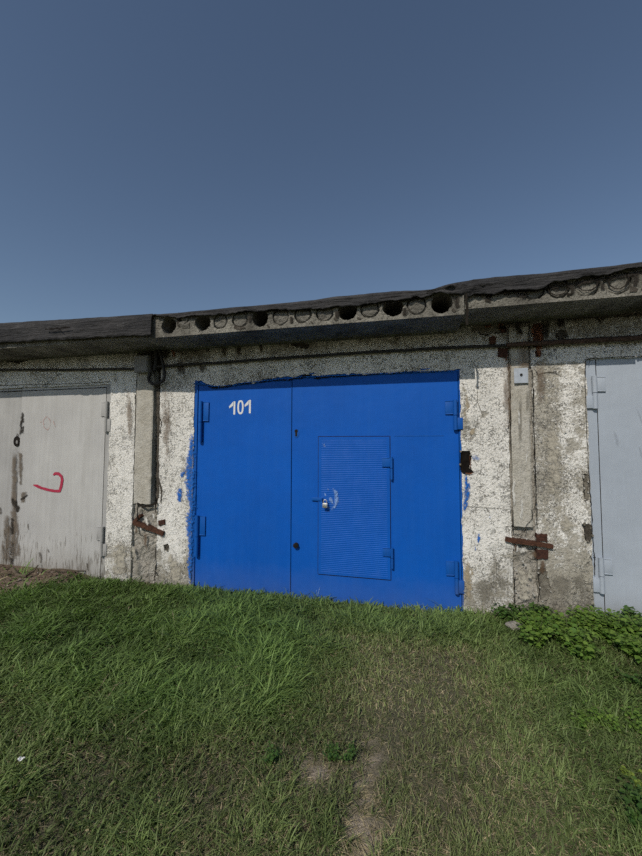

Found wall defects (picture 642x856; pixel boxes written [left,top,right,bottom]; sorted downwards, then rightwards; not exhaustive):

corrosion [1,452,26,560]
spalling [459,450,473,475]